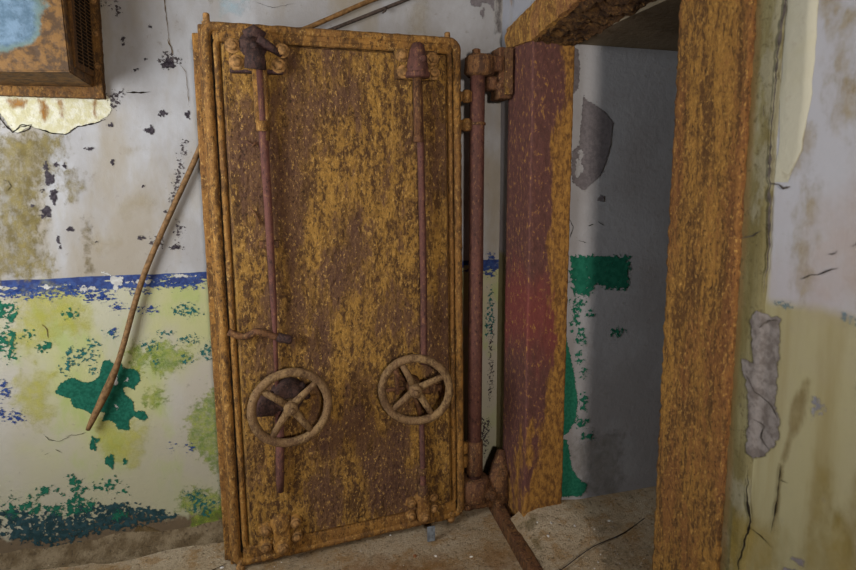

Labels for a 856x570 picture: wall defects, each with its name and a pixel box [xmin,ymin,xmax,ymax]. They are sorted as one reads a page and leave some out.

flaking render [0,90,146,135]
peeling [133,51,182,72]
peeling [571,48,614,190]
flaking render [774,0,819,182]
damp [0,135,83,277]
damp [137,219,185,250]
damp [164,139,189,213]
peeling [0,272,212,365]
peeling [55,327,148,430]
flaking render [740,311,781,459]
peeling [0,454,179,549]
crack [737,466,784,570]